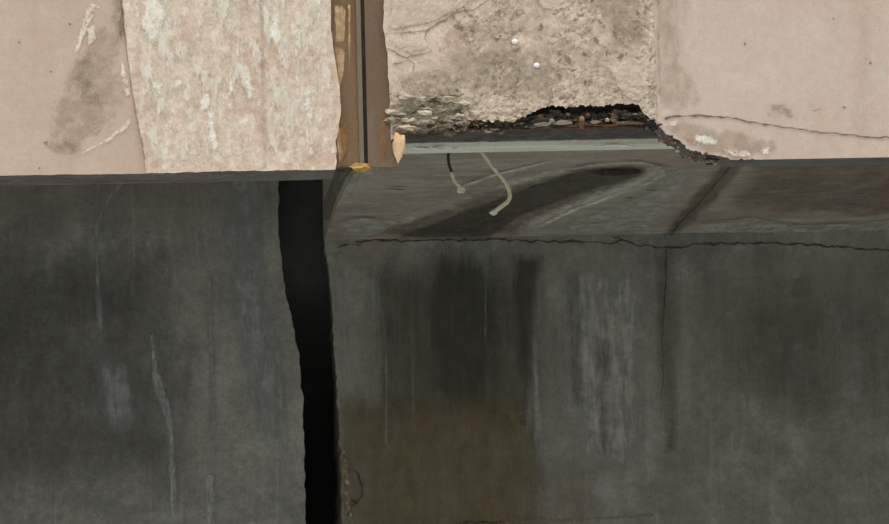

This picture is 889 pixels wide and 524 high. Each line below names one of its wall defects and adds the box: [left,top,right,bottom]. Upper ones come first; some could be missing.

peeling [390,0,471,52]
crack [385,0,490,70]
peeling [606,52,651,101]
spalling [384,73,775,165]
crack [665,114,889,139]
leakage [343,162,690,238]
crack [338,236,889,251]
leakage [342,259,541,524]
leakage [565,268,644,464]